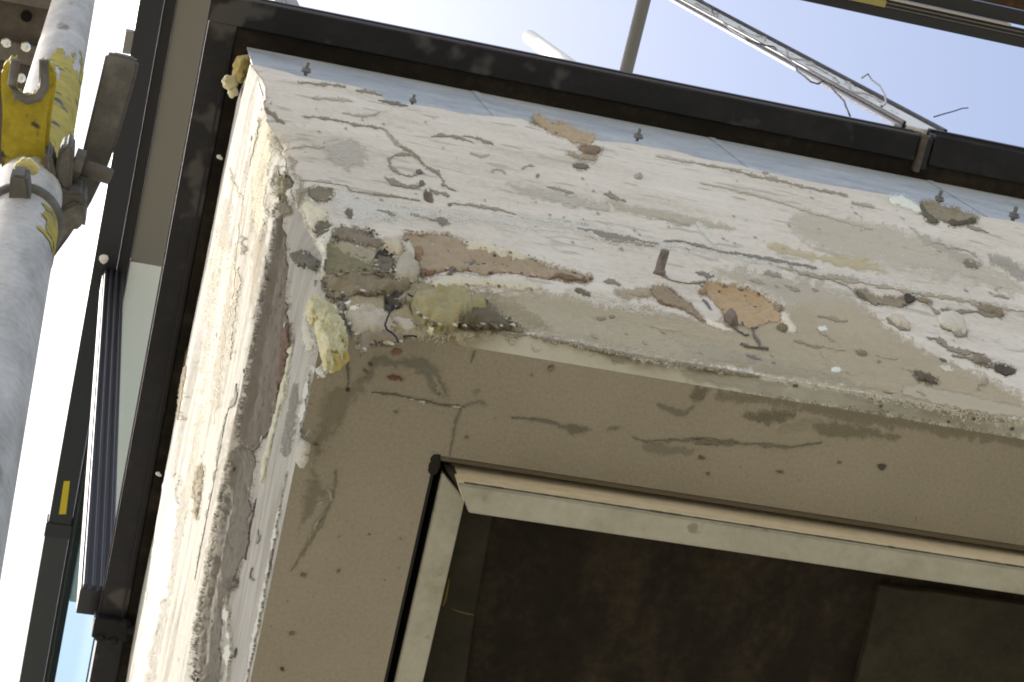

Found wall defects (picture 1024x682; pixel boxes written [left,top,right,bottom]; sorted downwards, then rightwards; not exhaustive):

spalling [529,111,604,171]
spalling [887,193,980,229]
crack [194,69,574,580]
spalling [627,279,800,336]
spalling [854,287,933,309]
spalling [975,304,1007,319]
spalling [972,353,1019,376]
spalling [186,119,594,682]
crack [632,437,823,450]